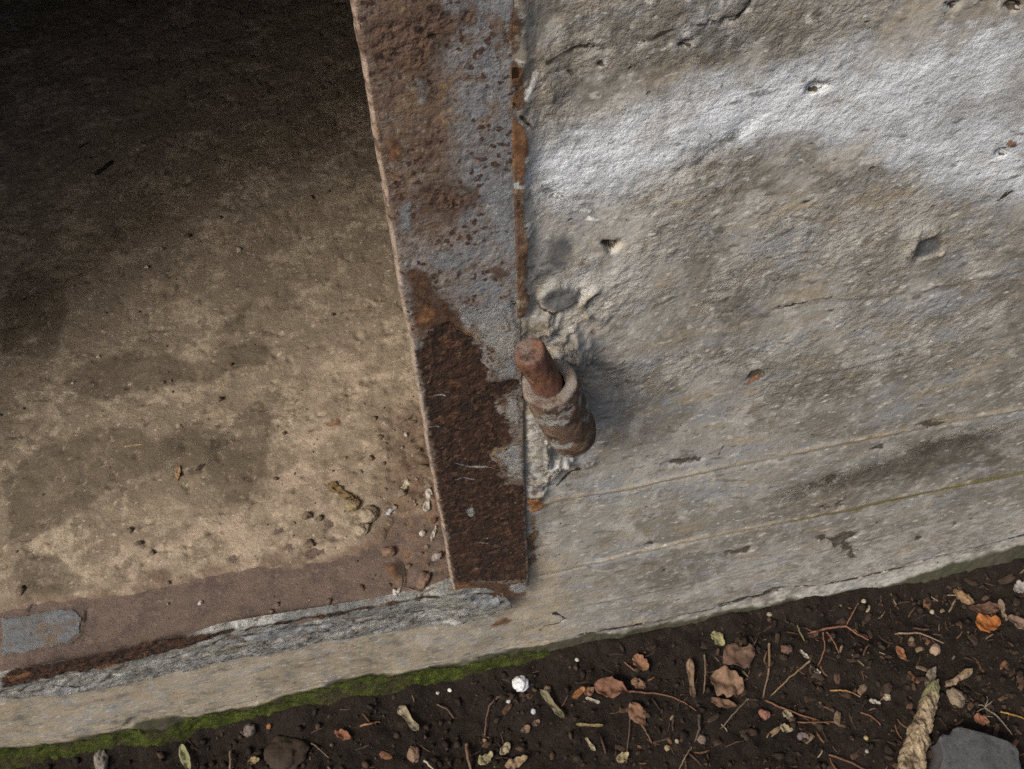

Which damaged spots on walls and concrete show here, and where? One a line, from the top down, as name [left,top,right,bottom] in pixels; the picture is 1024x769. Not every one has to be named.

rust [373,4,476,101]
rust [422,185,481,218]
rust [492,9,530,319]
rust [407,269,544,598]
rust [0,561,446,688]